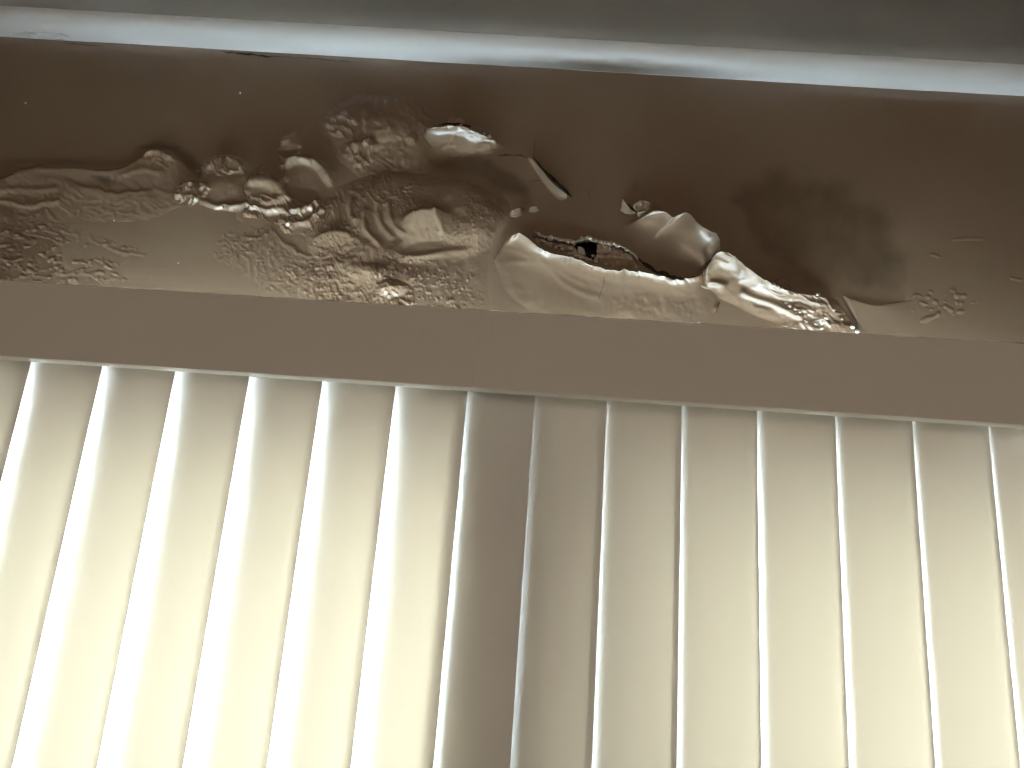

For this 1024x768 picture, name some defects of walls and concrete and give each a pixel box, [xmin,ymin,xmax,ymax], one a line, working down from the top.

crack [498,138,593,204]
peeling [510,206,540,217]
peeling [532,210,721,280]